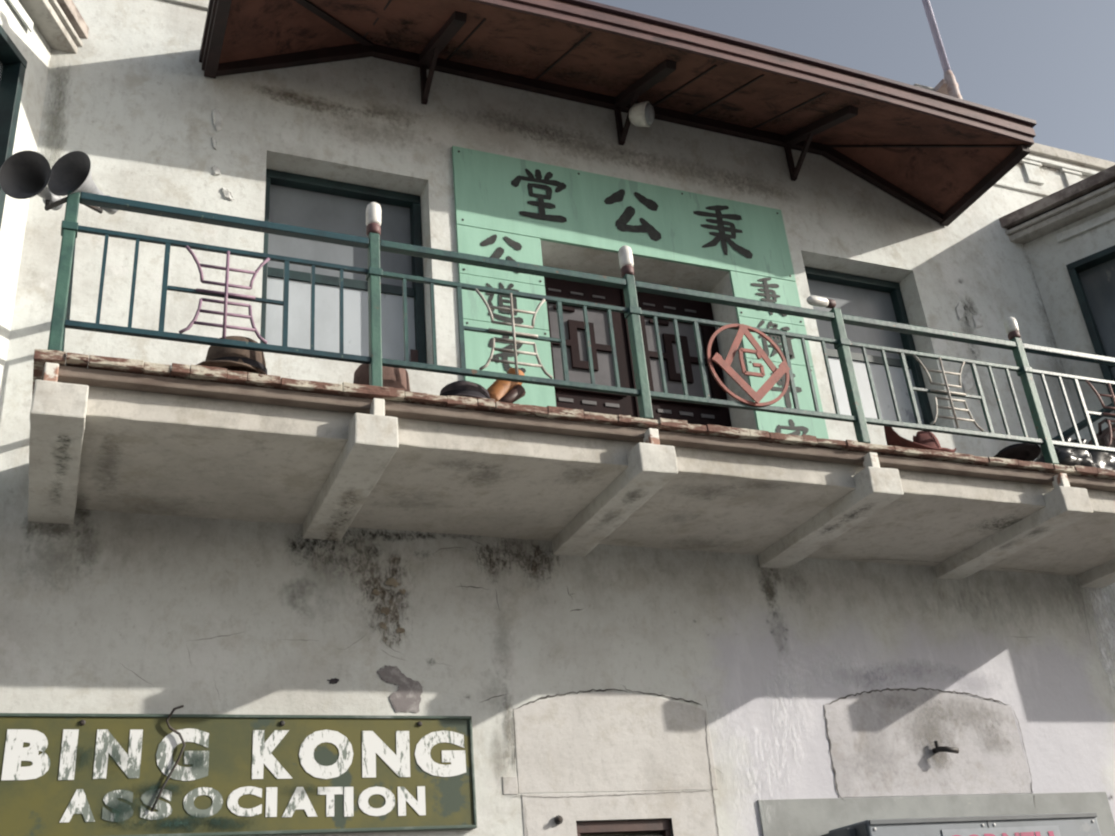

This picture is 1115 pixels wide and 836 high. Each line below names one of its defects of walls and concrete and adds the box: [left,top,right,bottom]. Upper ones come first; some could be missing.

peeling [377,665,423,713]